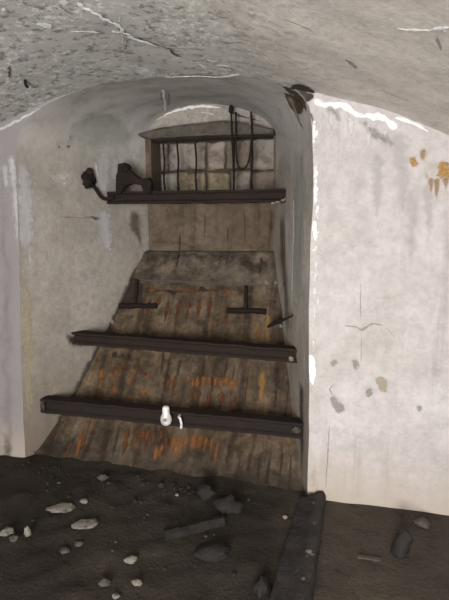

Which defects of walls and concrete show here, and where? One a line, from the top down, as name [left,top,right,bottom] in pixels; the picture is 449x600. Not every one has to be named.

crack [103,18,181,57]
spalling [283,84,314,126]
leakage [313,98,428,146]
rust [429,161,449,194]
leakage [3,158,34,249]
leakage [132,214,140,239]
rust [146,287,216,322]
crack [348,286,395,357]
rust [123,427,218,460]